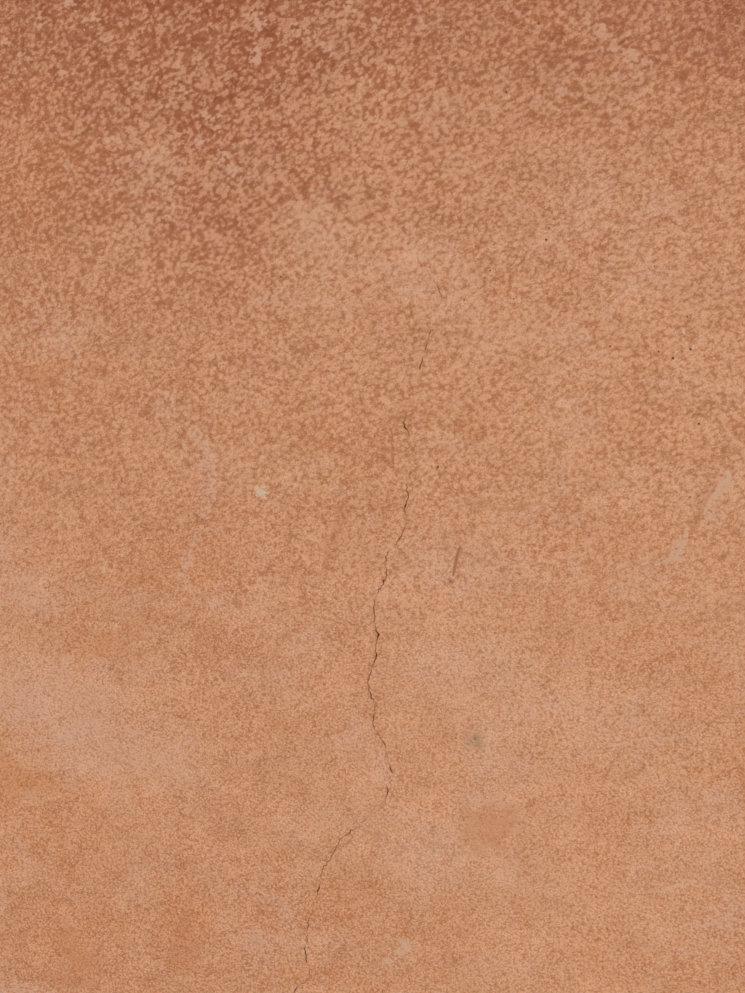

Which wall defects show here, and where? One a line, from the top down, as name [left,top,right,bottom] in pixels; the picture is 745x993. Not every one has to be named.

crack [293,279,443,993]